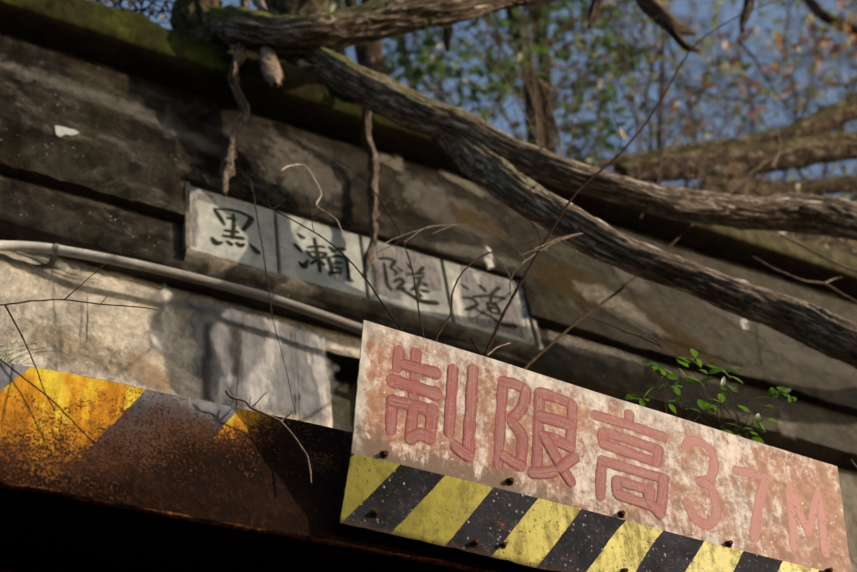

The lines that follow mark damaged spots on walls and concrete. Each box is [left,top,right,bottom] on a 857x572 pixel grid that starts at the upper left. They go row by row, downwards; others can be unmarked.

leakage [0,61,217,153]
leakage [152,283,336,421]